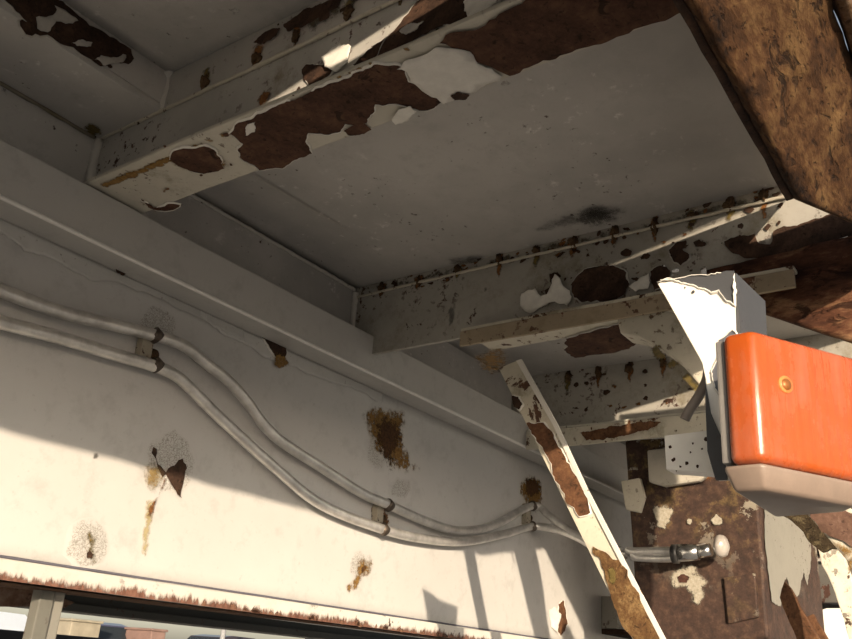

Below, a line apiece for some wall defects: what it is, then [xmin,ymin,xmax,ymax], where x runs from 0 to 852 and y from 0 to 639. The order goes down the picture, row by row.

peeling [1,0,135,68]
peeling [223,0,680,171]
peeling [163,144,232,176]
peeling [520,202,737,313]
peeling [721,214,852,258]
spalling [147,447,187,497]
rust [364,408,414,500]
rust [520,476,542,504]
spalling [143,499,157,555]
rust [346,548,374,592]
rust [0,572,484,639]
spalling [549,600,568,636]